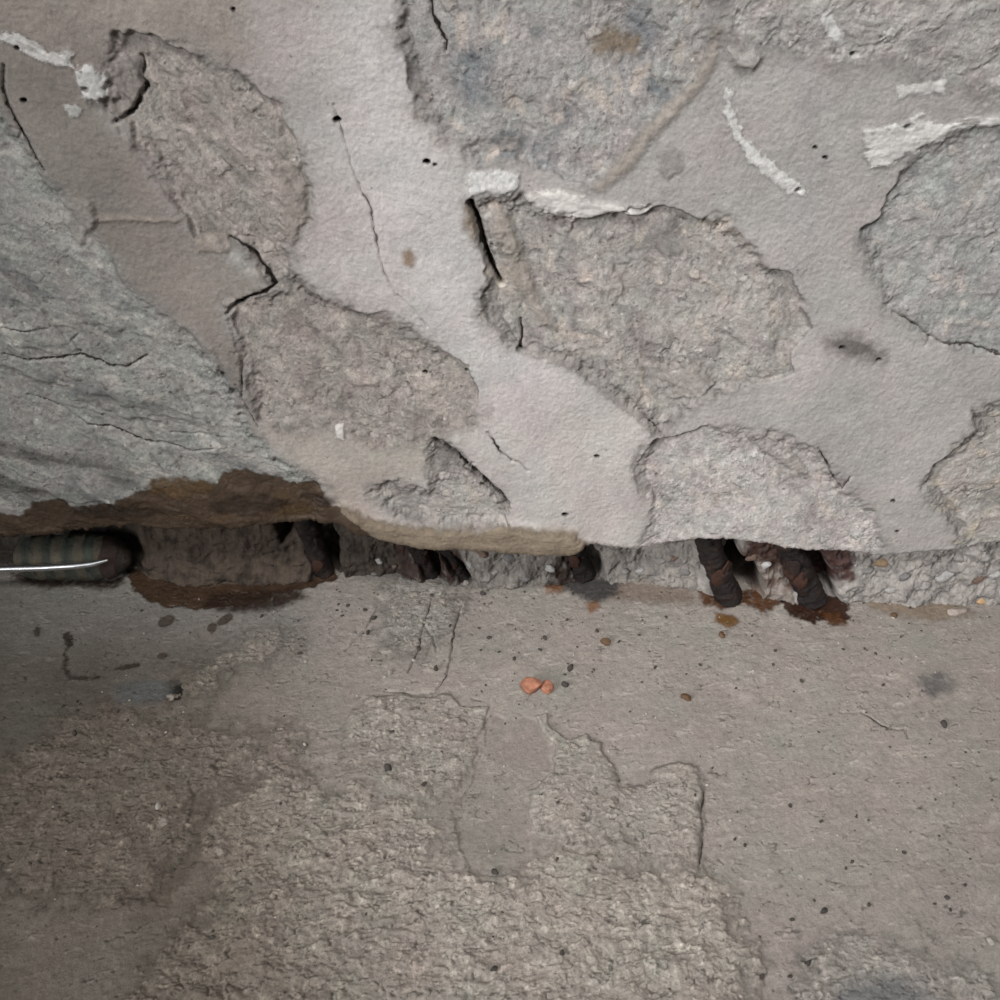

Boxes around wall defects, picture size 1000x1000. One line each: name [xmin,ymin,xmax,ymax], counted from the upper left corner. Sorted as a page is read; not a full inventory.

spalling [395,0,1000,191]
crack [358,182,378,245]
crack [470,198,500,277]
spalling [860,124,1000,354]
spalling [0,30,510,532]
crack [6,329,148,367]
spalling [472,193,885,610]
spalling [920,400,1000,548]
spalling [404,545,470,583]
corrosion [748,541,781,569]
corrosion [809,549,855,581]
corrosion [740,590,851,626]